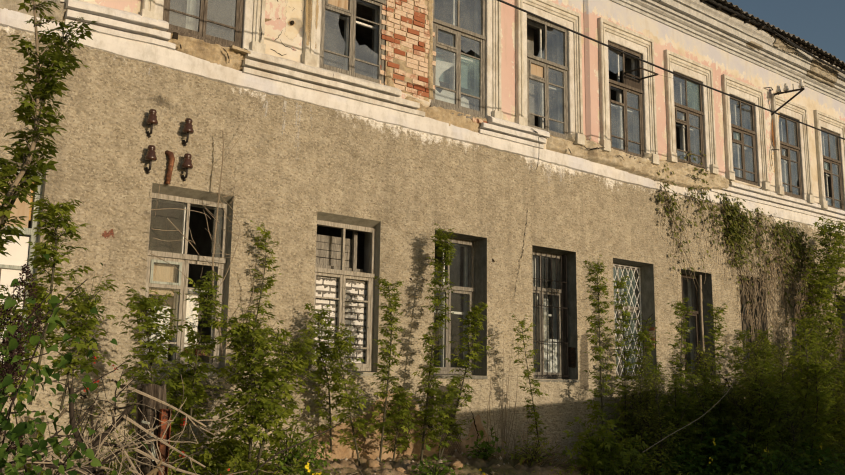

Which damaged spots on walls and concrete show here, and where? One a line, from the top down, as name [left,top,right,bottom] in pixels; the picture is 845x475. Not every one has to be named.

peeling [284,0,304,41]
flaking render [163,32,251,71]
flaking render [378,0,488,133]
flaking render [546,133,729,191]